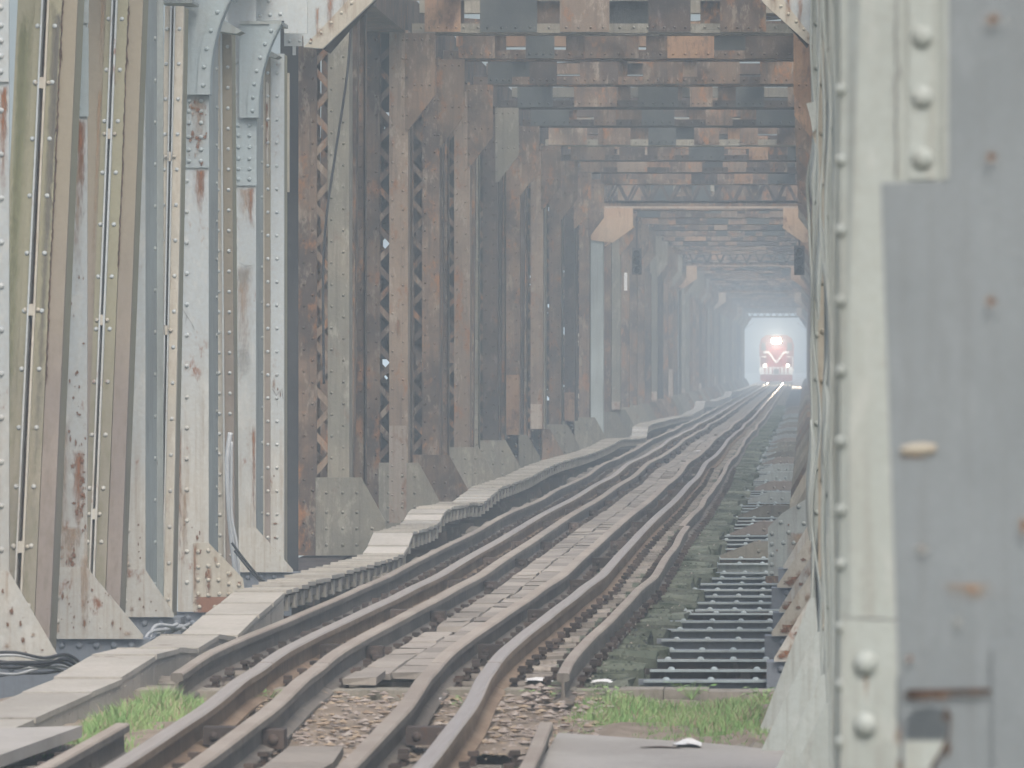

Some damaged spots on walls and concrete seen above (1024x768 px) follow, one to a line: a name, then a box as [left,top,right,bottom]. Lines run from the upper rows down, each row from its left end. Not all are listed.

rust [76,122,84,184]
rust [196,161,204,204]
rust [57,430,129,634]
rust [194,531,227,612]